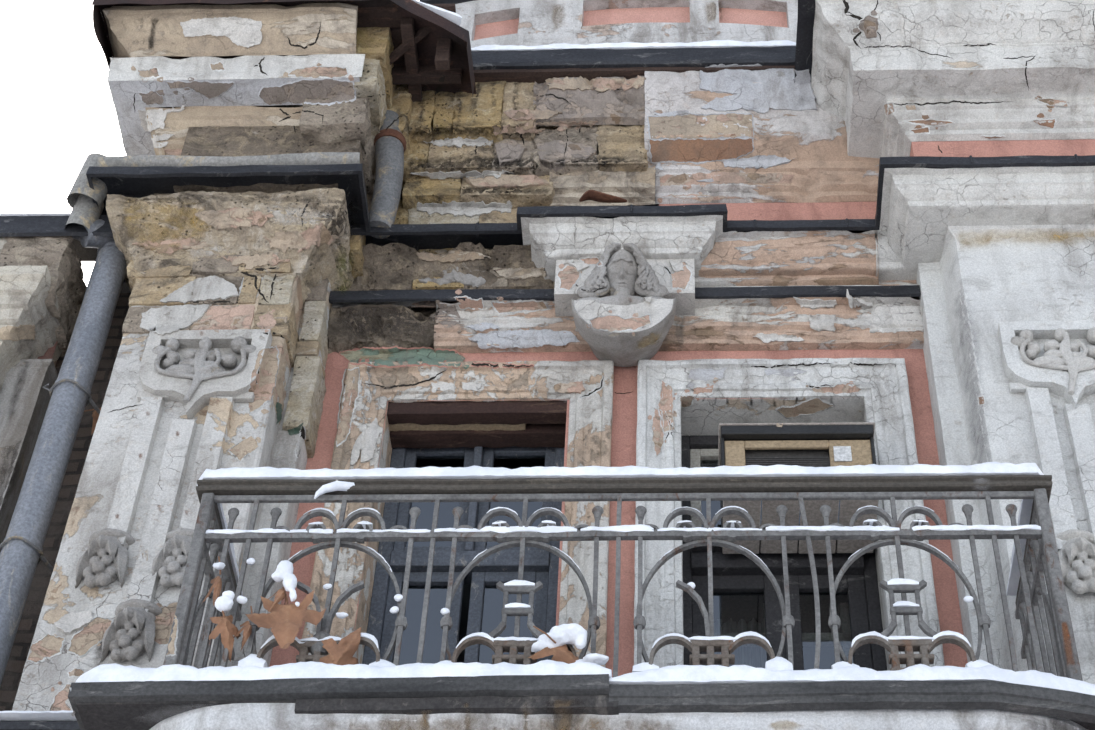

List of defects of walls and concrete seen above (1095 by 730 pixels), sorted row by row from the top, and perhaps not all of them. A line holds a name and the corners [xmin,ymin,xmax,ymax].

peeling [180,17,262,48]
crack [841,0,1071,107]
peeling [131,61,235,148]
peeling [258,63,357,107]
spalling [387,64,818,224]
spalling [106,187,603,466]
peeling [586,297,652,336]
peeling [752,333,804,343]
peeling [793,289,924,333]
peeling [27,609,113,716]
damp [383,714,469,730]
damp [510,702,605,730]